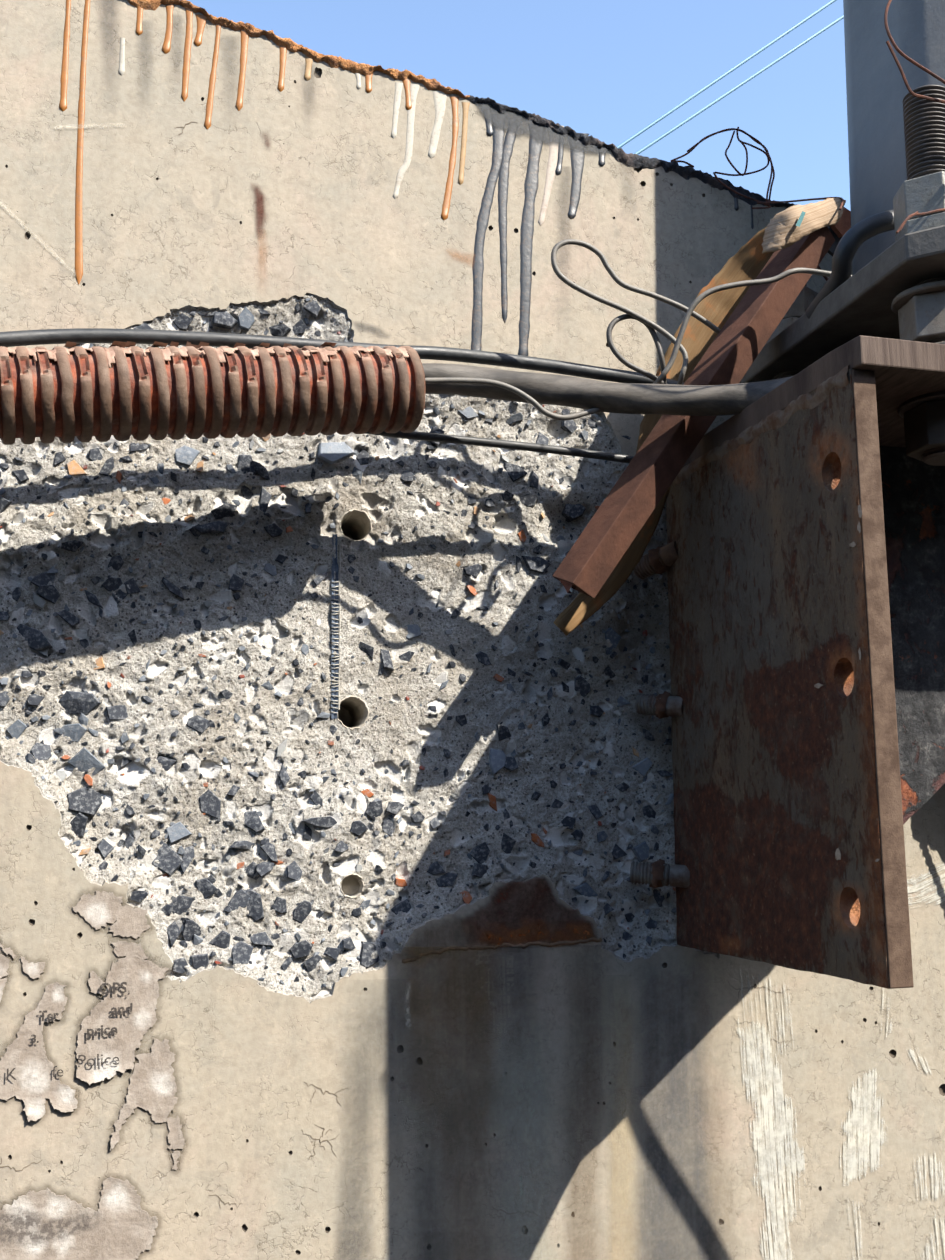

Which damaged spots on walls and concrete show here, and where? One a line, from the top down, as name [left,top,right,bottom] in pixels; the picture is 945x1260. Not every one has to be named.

corrosion [255,187,264,230]
spalling [64,294,352,349]
spalling [0,394,677,1002]
corrosion [407,878,595,955]
water stain [641,983,711,1260]